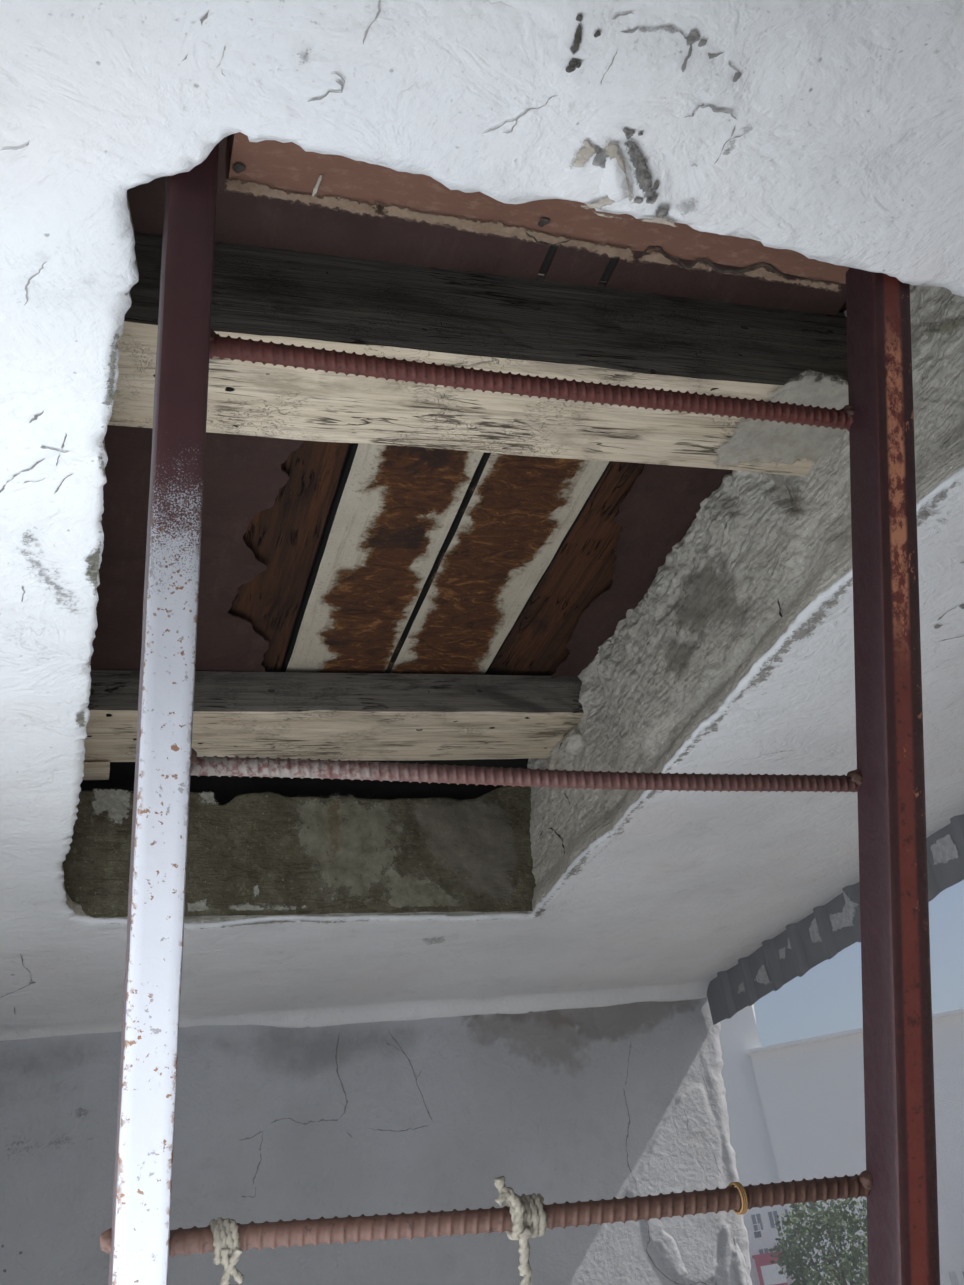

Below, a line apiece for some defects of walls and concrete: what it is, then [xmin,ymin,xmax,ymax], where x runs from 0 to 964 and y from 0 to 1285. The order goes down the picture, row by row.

crack [600,12,742,164]
spalling [570,128,676,227]
peeling [224,179,840,292]
spalling [103,333,120,414]
spalling [85,521,101,596]
peeling [315,445,584,675]
crack [241,1028,433,1198]